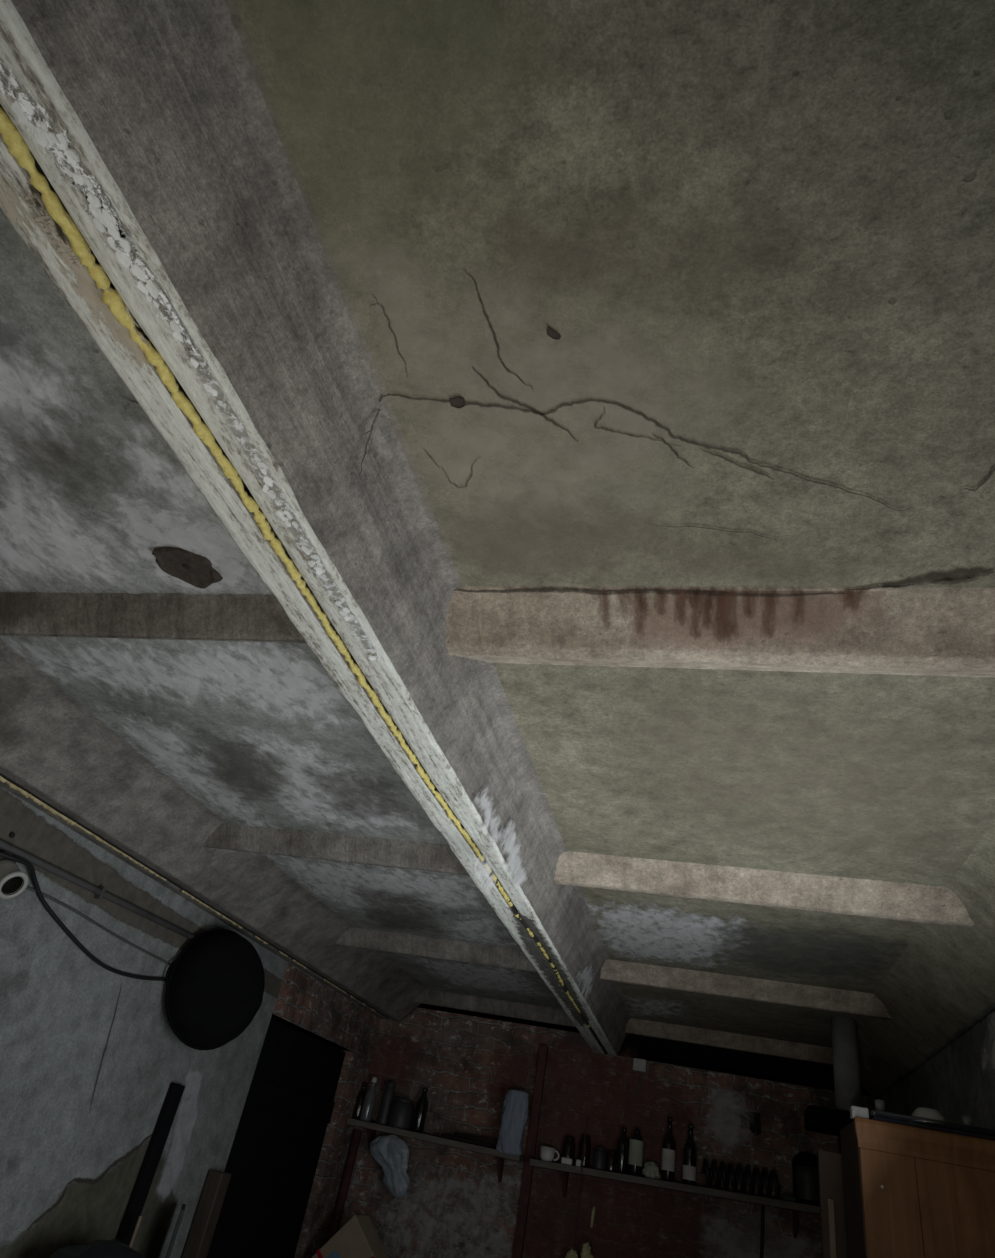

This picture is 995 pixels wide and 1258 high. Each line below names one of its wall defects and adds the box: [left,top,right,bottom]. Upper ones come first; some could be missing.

leakage [0,313,269,594]
peeling [0,61,378,661]
crack [359,269,912,511]
corrosion [637,590,775,637]
crack [454,570,994,597]